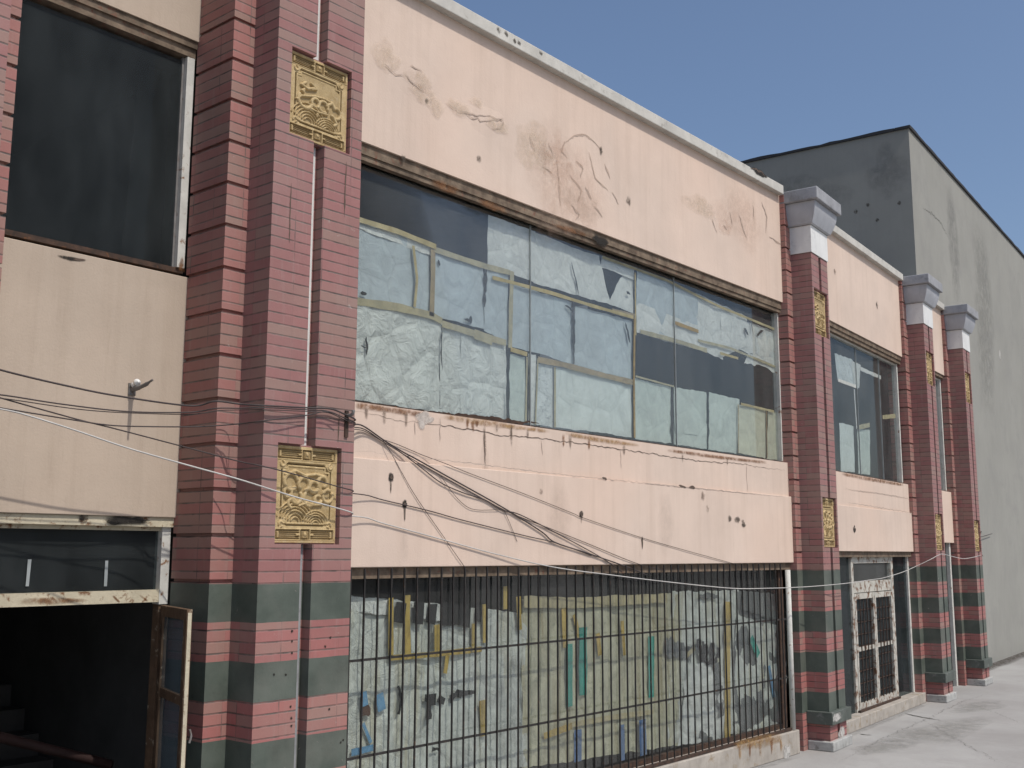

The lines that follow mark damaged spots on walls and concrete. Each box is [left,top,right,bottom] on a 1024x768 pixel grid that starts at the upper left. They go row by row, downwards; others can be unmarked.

rust [358,404,420,424]
rust [467,419,543,454]